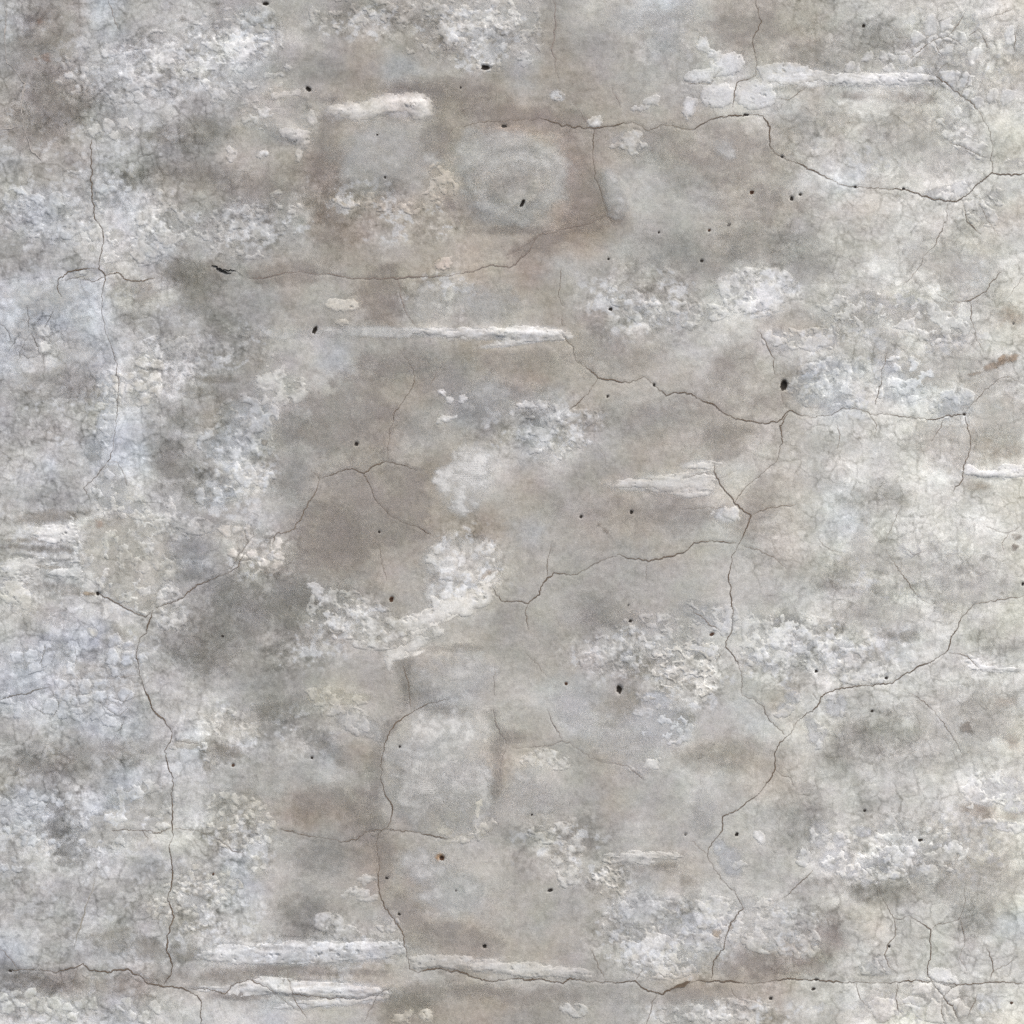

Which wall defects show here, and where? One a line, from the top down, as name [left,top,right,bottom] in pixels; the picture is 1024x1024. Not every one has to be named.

peeling [55,2,435,163]
peeling [682,13,1016,120]
water stain [457,91,628,252]
crack [203,5,1024,352]
crack [1,141,153,498]
spalling [411,325,574,347]
crack [0,360,437,1022]
peeling [305,538,499,671]
crack [282,271,1024,1023]
spalling [196,912,593,1010]